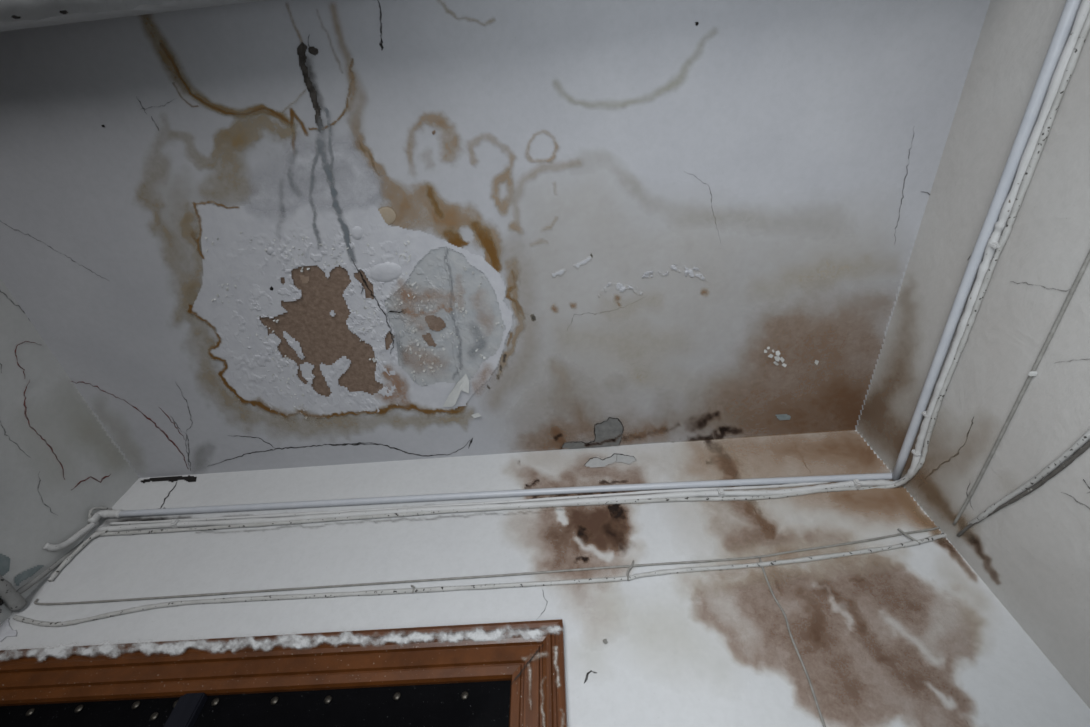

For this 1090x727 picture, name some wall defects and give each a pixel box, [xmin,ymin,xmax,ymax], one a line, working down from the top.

leakage [138,6,473,433]
peeling [192,143,513,419]
crack [351,258,403,354]
leakage [355,134,524,389]
crack [0,341,110,513]
crack [71,381,473,509]
leakage [525,413,595,451]
leakage [525,458,651,587]
leakage [618,424,668,446]
leakage [689,311,974,727]